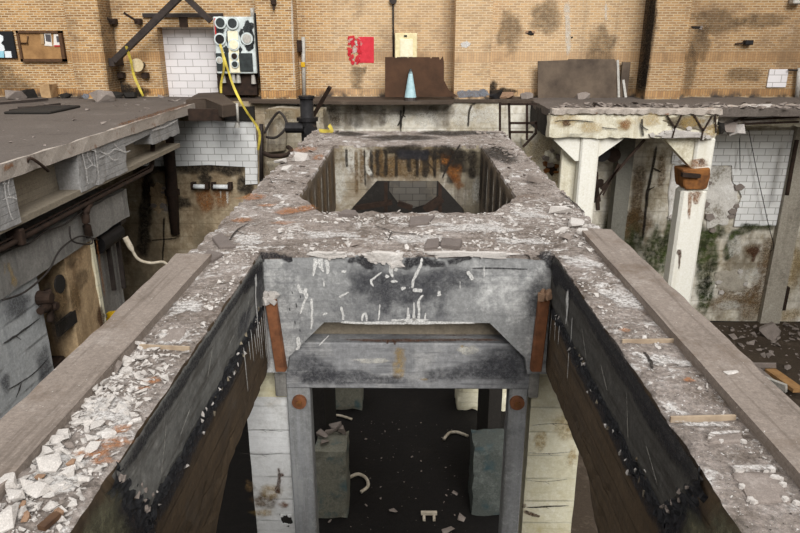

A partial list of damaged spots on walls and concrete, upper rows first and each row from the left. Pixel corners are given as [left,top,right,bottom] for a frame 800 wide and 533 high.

spalling [649,103,800,141]
water stain [305,149,510,213]
spalling [704,165,745,233]
water stain [297,285,313,329]
spalling [306,250,347,261]
spalling [358,250,405,269]
water stain [339,258,474,325]
spalling [424,250,519,259]
water stain [712,238,772,320]